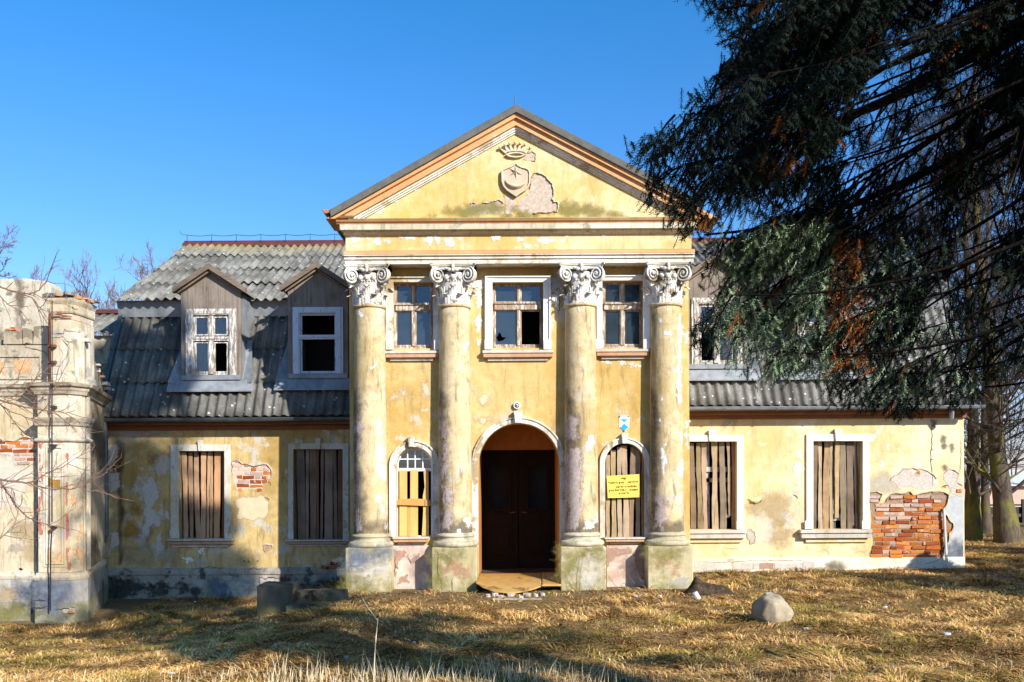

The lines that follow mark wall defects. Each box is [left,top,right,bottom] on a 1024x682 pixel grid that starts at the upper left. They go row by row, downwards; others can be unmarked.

spalling [468,150,559,215]
damp [558,203,623,217]
peeling [349,235,462,248]
peeling [514,234,569,248]
flaking render [231,459,273,492]
peeling [564,411,599,532]
flaking render [0,436,83,570]
flaking render [138,476,170,555]
flaking render [869,444,963,564]
peeling [394,550,419,584]
damp [108,576,263,599]